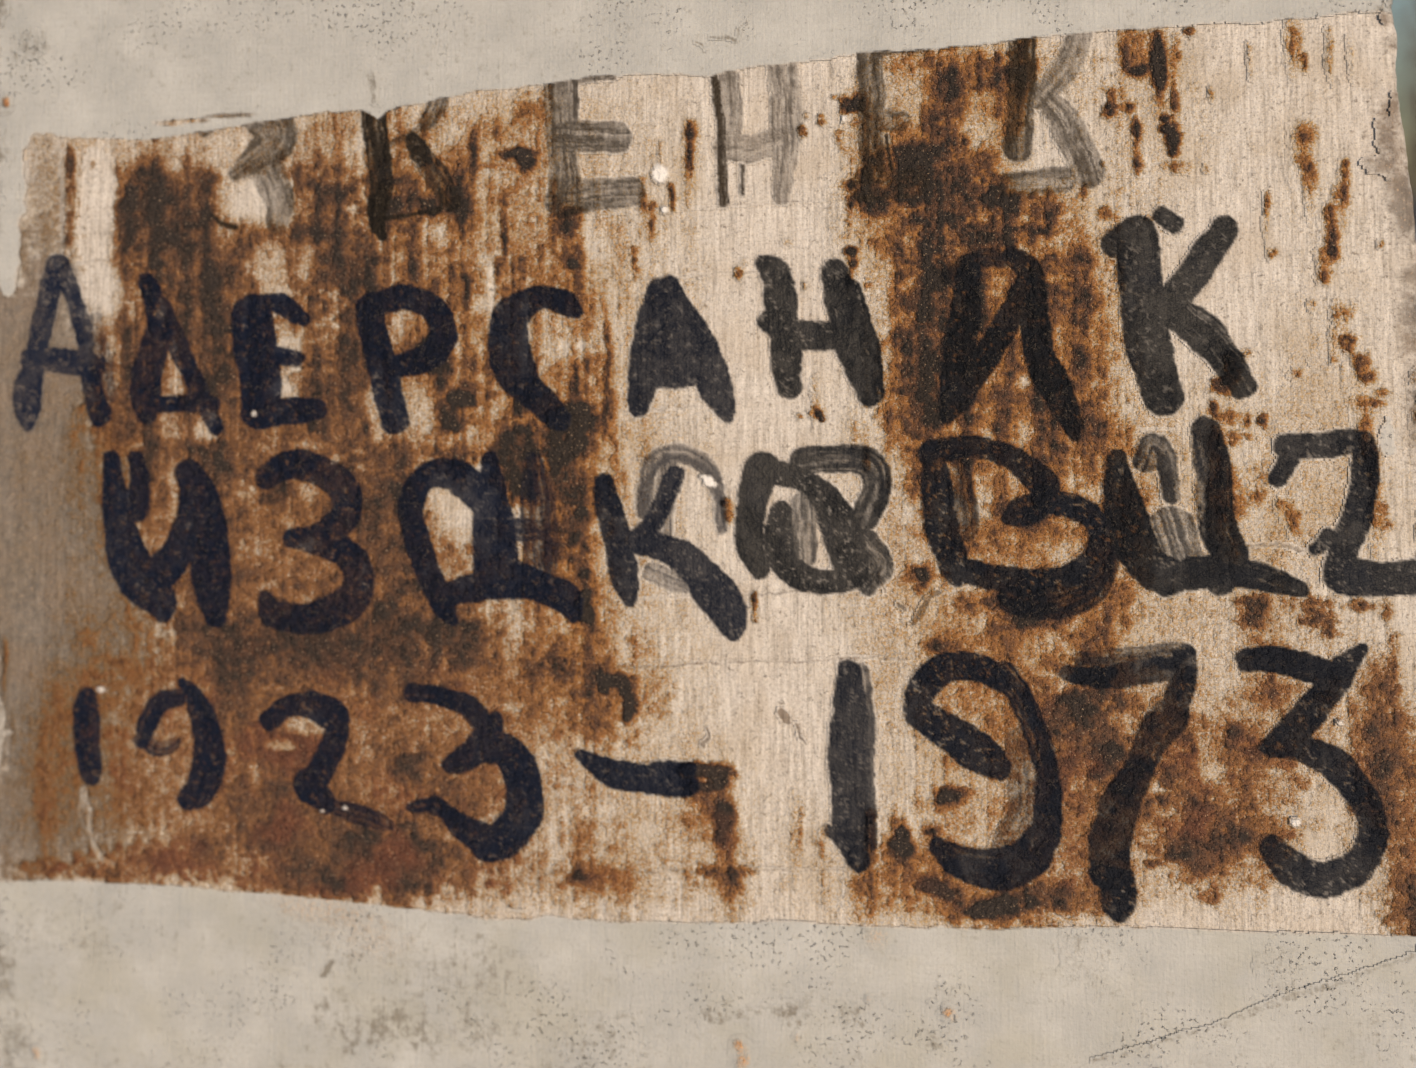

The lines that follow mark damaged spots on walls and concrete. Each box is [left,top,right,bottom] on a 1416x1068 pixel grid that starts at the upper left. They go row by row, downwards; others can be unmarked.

rust [0,85,808,923]
rust [794,375,829,433]
rust [803,19,1416,936]